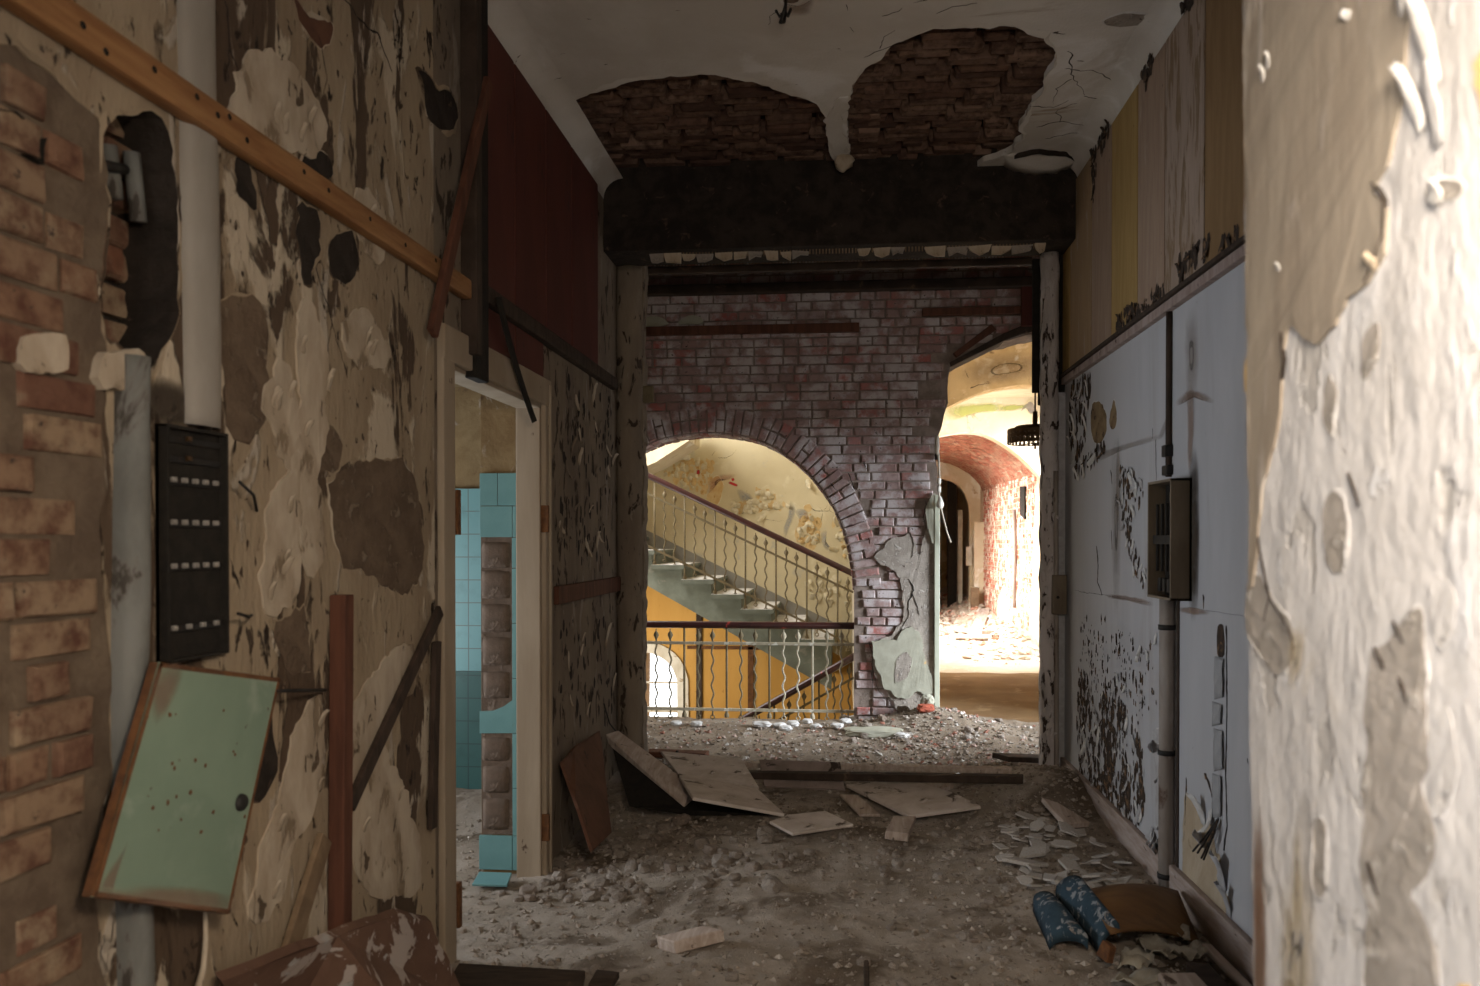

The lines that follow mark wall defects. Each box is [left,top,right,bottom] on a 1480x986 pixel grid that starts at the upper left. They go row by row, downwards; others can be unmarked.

peeling [232,156,257,211]
peeling [227,48,333,179]
spalling [576,22,1057,173]
peeling [1339,8,1351,23]
peeling [1388,0,1443,149]
flaking render [0,33,113,986]
peeling [221,199,425,676]
spalling [1322,372,1338,440]
spalling [1322,472,1359,575]
spalling [1361,322,1380,381]
damp [1076,615,1157,827]
spalling [1359,605,1471,986]